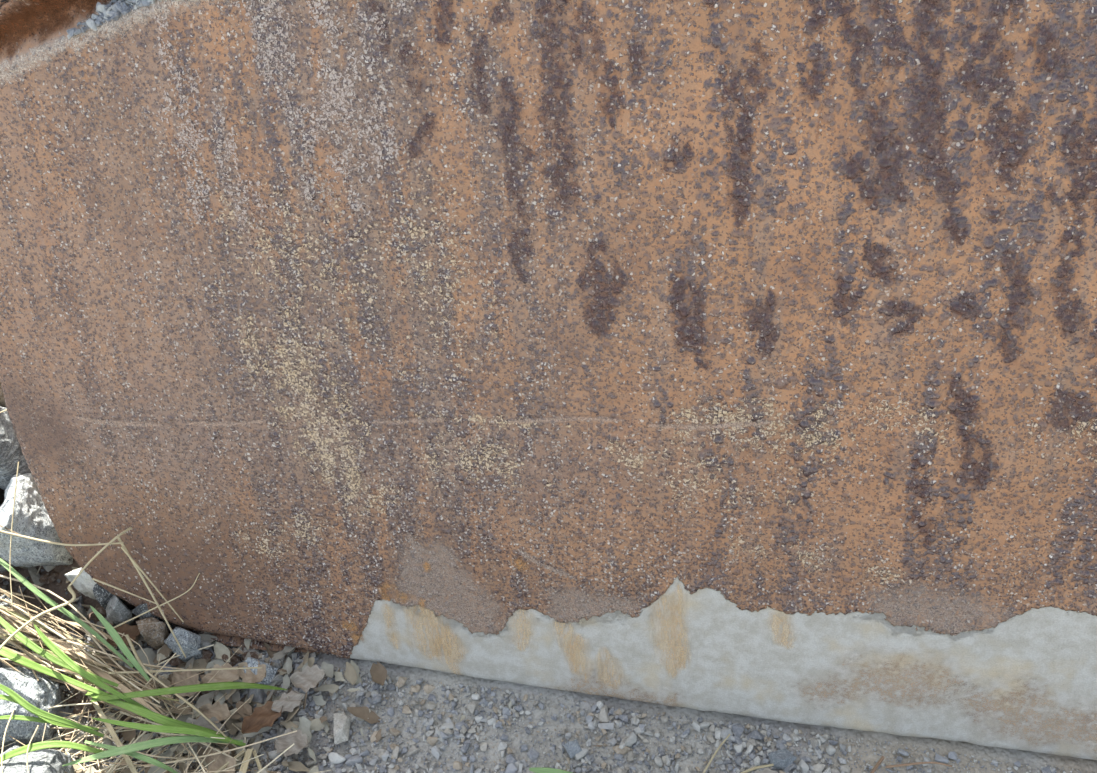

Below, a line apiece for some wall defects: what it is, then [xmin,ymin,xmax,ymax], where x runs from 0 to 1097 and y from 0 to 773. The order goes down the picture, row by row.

rust [0,0,111,56]
spalling [342,577,1097,760]